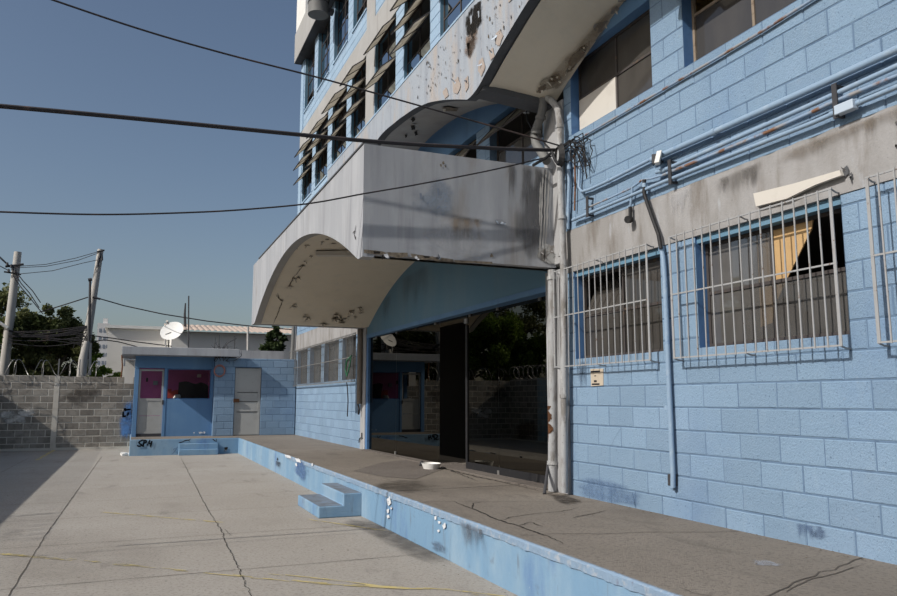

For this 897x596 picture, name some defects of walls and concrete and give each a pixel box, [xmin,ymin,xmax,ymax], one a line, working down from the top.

peeling [417,46,468,112]
peeling [477,0,522,76]
peeling [537,45,585,94]
water stain [509,166,550,255]
crack [172,439,252,596]
crack [787,564,864,591]